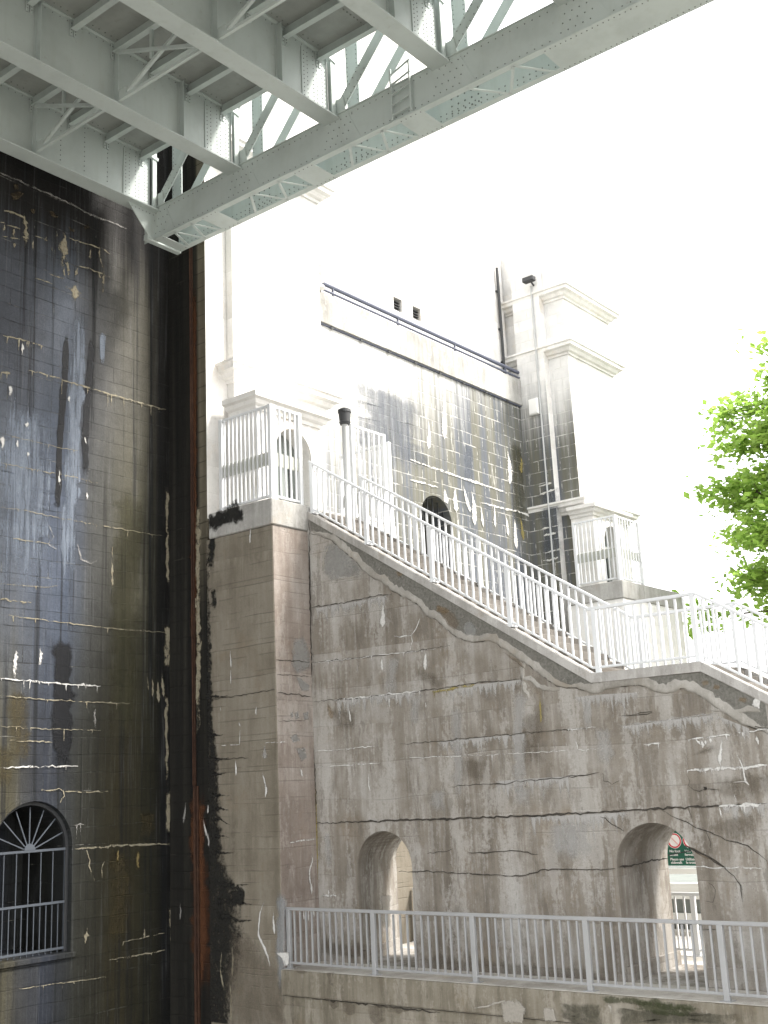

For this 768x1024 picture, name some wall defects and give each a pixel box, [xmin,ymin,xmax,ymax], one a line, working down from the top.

water stain [0,210,110,299]
water stain [0,316,169,603]
water stain [365,390,529,548]
crack [219,527,515,721]
water stain [0,641,130,769]
water stain [77,843,167,867]
water stain [147,677,169,774]
water stain [195,500,289,1024]
crack [406,728,585,745]
water stain [409,680,637,801]
crack [314,749,767,902]
water stain [623,714,768,773]